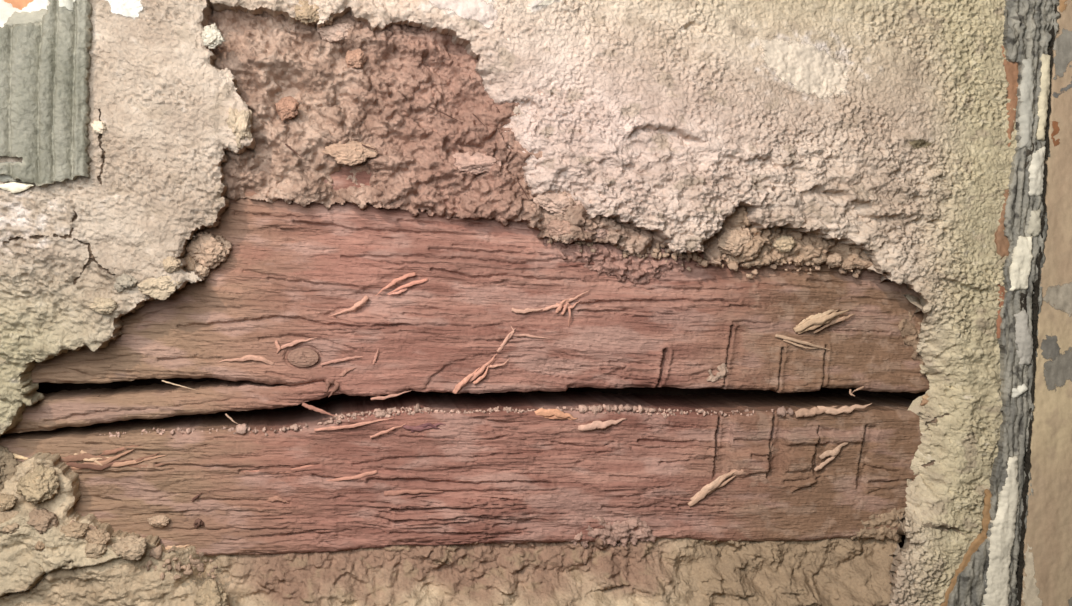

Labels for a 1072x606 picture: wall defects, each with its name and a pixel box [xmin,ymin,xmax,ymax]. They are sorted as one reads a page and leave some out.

peeling [107,0,143,19]
peeling [0,0,93,193]
crack [97,110,109,185]
flaking render [619,123,880,218]
crack [2,210,115,285]
flaking render [68,262,115,296]